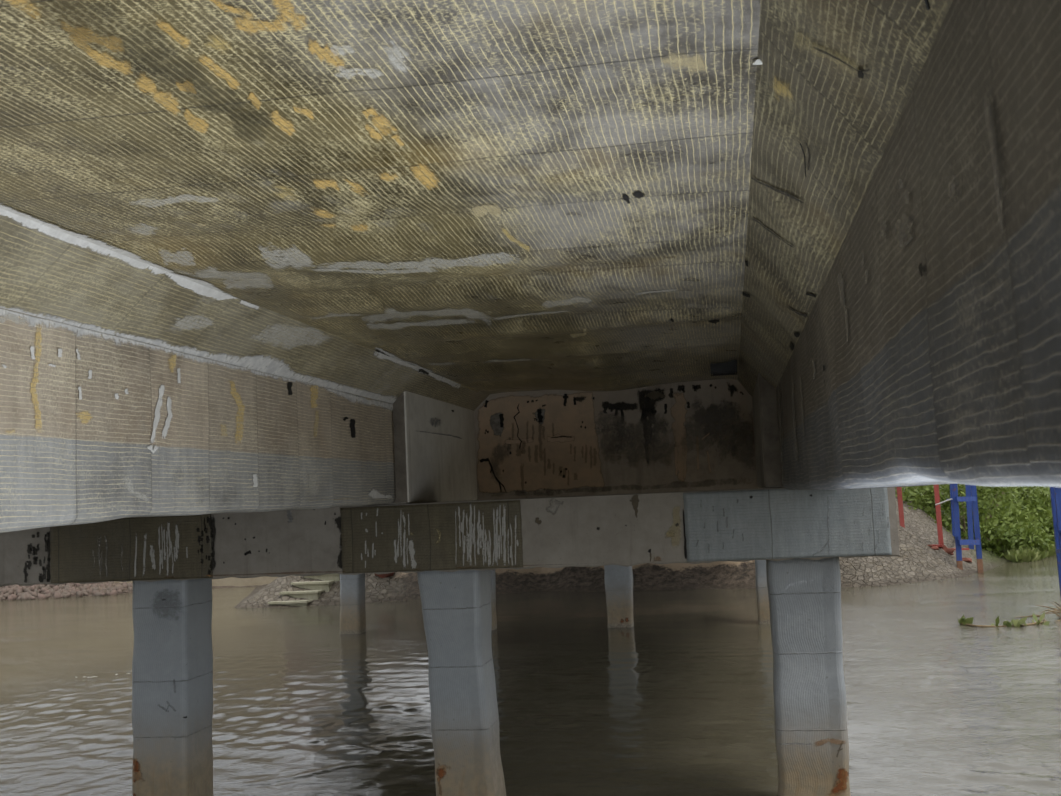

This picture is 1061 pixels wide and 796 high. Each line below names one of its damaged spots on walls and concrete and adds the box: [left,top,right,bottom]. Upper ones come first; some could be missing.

leakage [602,384,744,463]
rust [832,768,849,793]